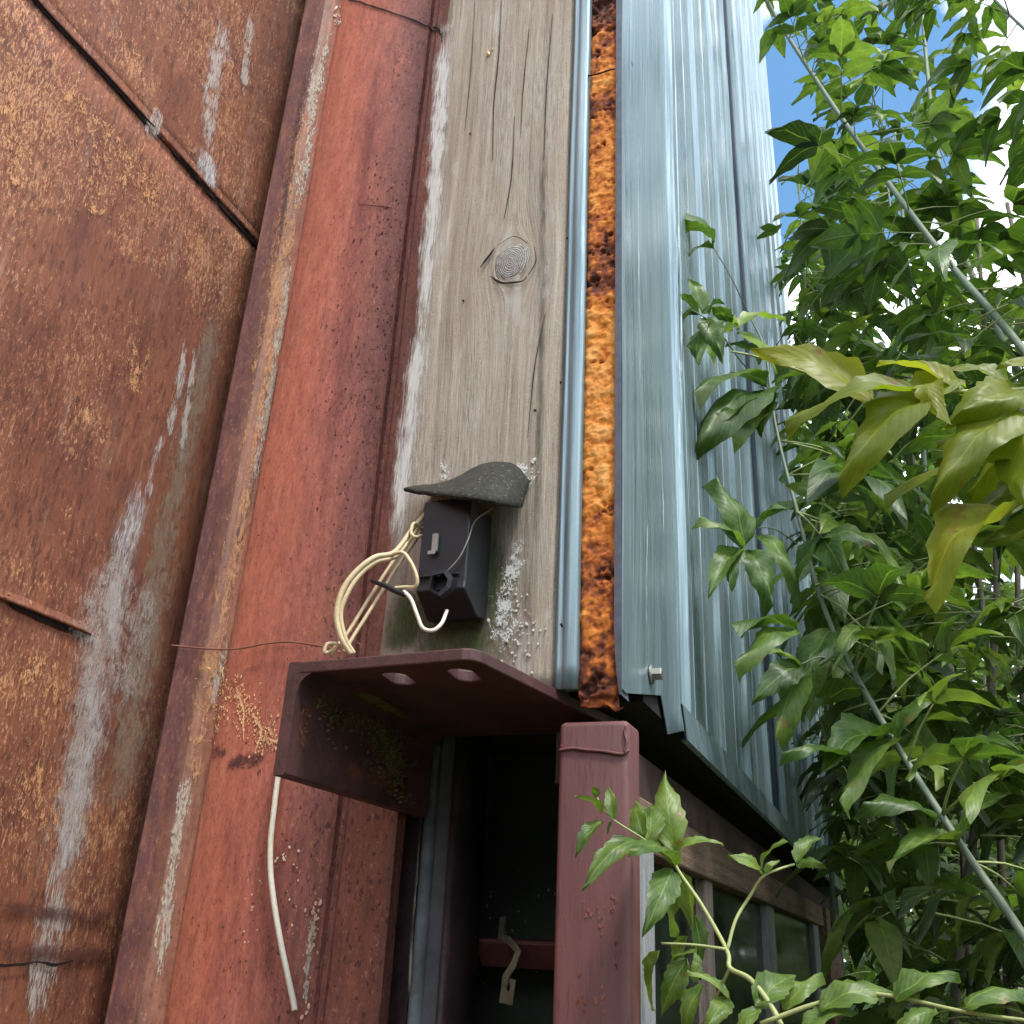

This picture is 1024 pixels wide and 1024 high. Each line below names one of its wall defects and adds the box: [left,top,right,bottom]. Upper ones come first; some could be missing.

damp [241,20,254,89]
rust [0,85,35,198]
rust [51,70,167,220]
damp [145,108,163,139]
damp [197,24,229,187]
damp [392,45,450,535]
rust [116,336,152,392]
rust [73,398,111,448]
rust [7,640,80,728]
damp [28,344,196,1017]
rust [0,757,68,848]
rust [212,746,264,769]